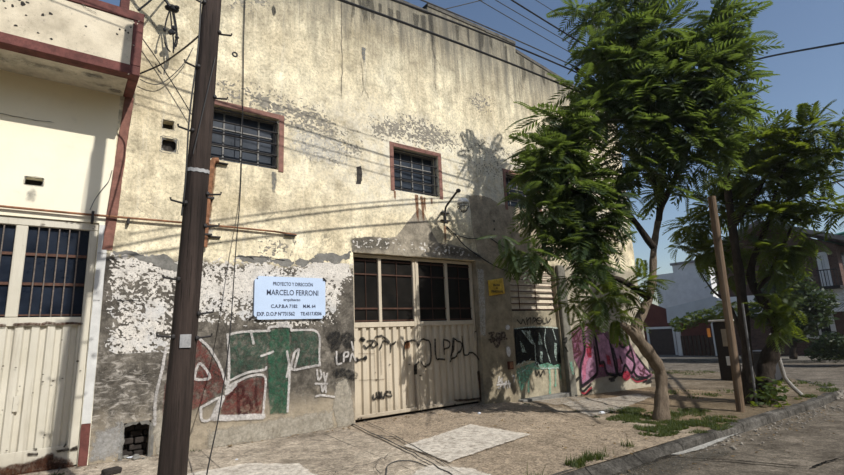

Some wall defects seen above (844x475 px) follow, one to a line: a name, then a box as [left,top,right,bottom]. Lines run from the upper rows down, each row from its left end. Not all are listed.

peeling [217,80,513,184]
damp [463,92,495,113]
corrosion [415,195,433,219]
peeling [104,250,178,354]
peeling [198,232,477,328]